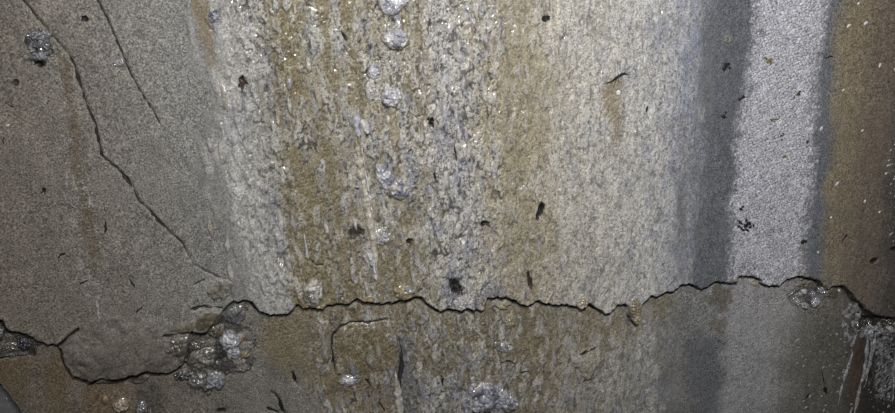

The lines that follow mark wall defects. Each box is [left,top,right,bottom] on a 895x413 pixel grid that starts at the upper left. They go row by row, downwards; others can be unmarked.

crack [22,0,258,364]
damp [182,0,895,413]
crack [495,294,523,310]
crack [622,304,640,327]
crack [796,276,883,320]
spalling [0,320,40,358]
spalling [164,302,261,395]
crack [331,295,404,413]
crack [96,372,151,384]
crack [267,392,285,413]